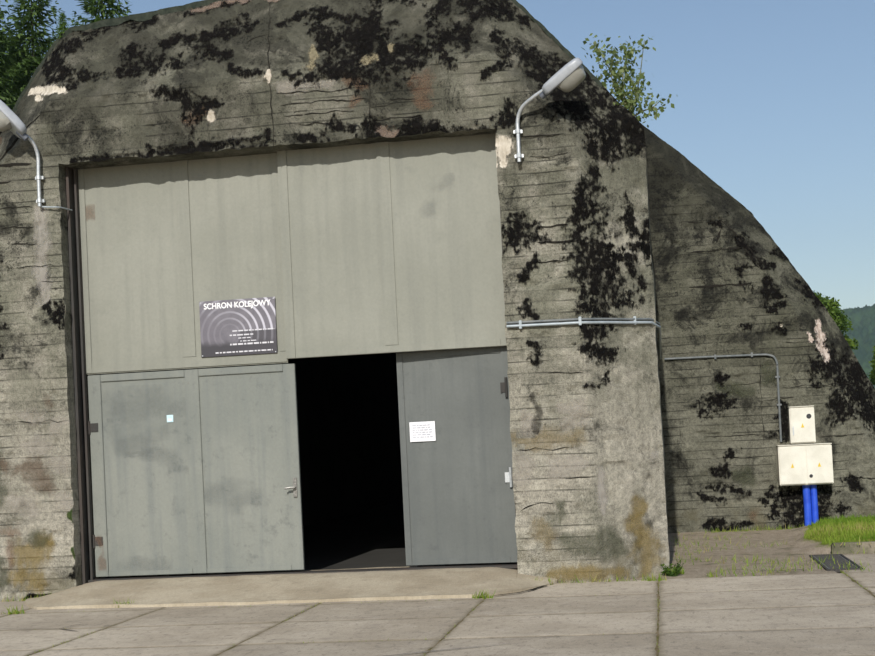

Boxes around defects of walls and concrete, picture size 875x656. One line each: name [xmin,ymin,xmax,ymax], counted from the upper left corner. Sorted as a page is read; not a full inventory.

spalling [28,84,67,102]
damp [41,0,276,164]
crack [248,2,418,147]
spalling [495,135,514,168]
damp [275,0,652,389]
damp [731,231,827,336]
spalling [807,319,830,362]
damp [693,372,737,419]
damp [769,399,789,443]
damp [807,337,875,436]
damp [702,516,754,532]
damp [697,447,865,529]